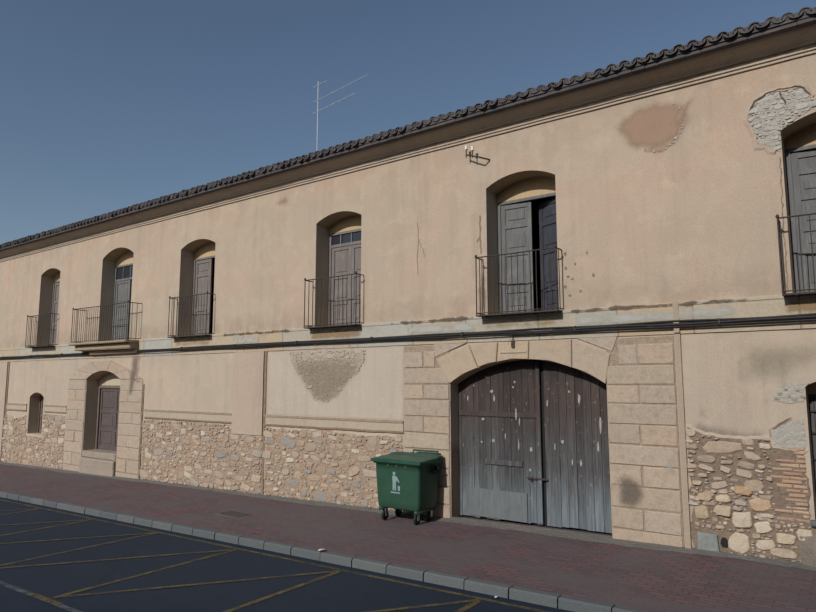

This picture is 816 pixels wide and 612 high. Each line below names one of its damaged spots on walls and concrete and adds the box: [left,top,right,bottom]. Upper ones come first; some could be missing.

flaking render [621,102,689,153]
flaking render [743,84,816,155]
flaking render [289,348,366,402]
flaking render [773,382,809,404]
damp [622,480,640,504]